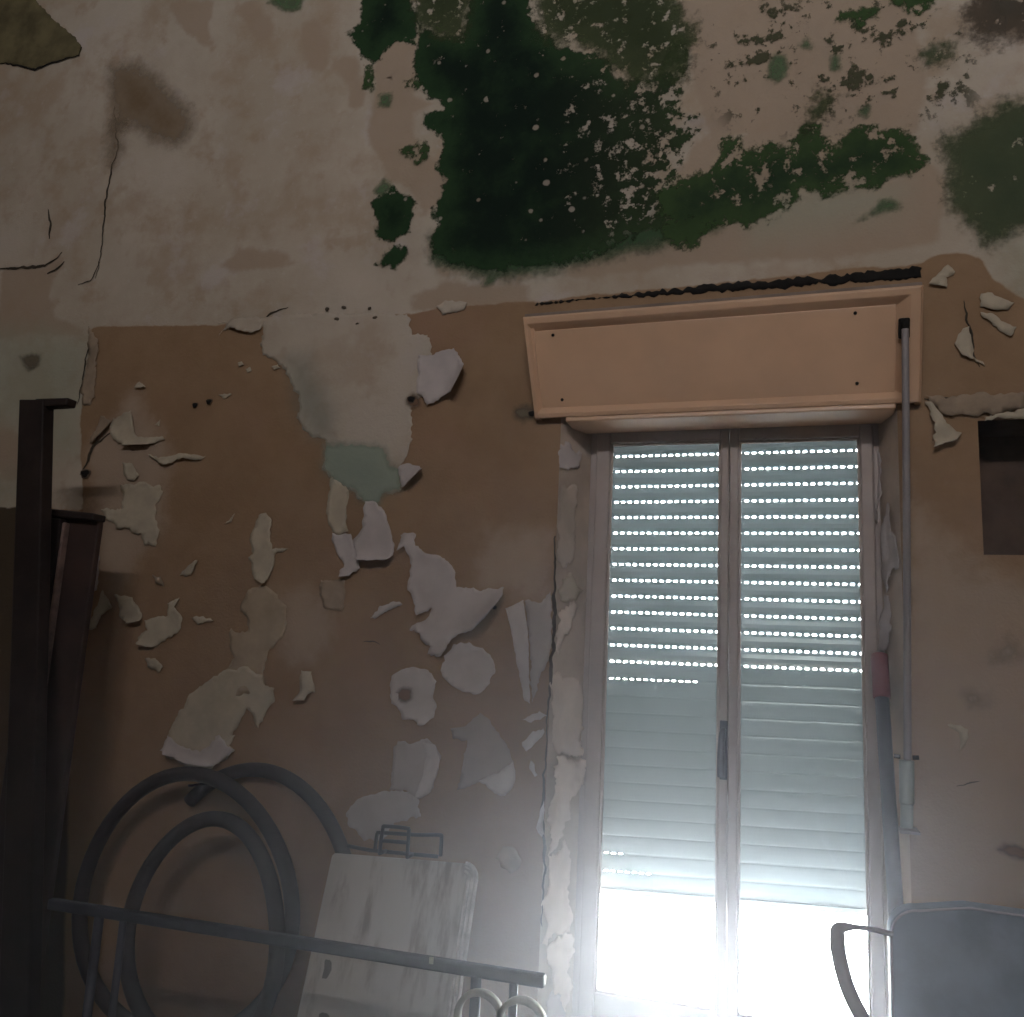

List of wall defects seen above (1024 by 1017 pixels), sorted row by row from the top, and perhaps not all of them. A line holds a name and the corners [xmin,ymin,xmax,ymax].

crack [0,106,119,285]
water stain [109,65,190,157]
water stain [347,0,934,285]
water stain [942,101,1024,247]
crack [535,266,922,306]
peeling [980,292,1016,336]
peeling [89,411,205,465]
peeling [925,391,1024,447]
peeling [89,556,213,673]
peeling [160,513,289,769]
peeling [218,306,586,1017]
crack [540,536,557,926]